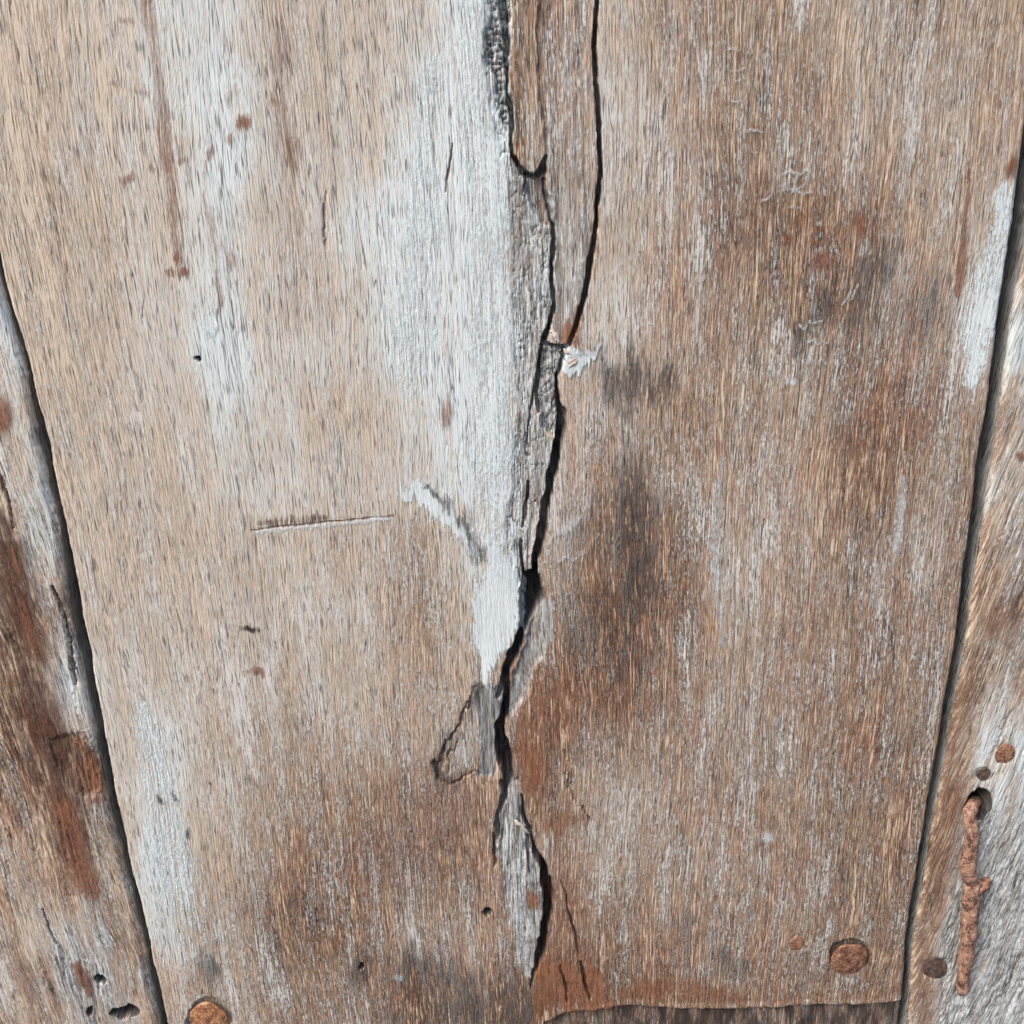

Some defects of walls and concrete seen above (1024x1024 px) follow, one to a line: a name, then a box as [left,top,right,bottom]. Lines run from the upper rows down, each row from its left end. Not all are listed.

crack [432,0,603,998]